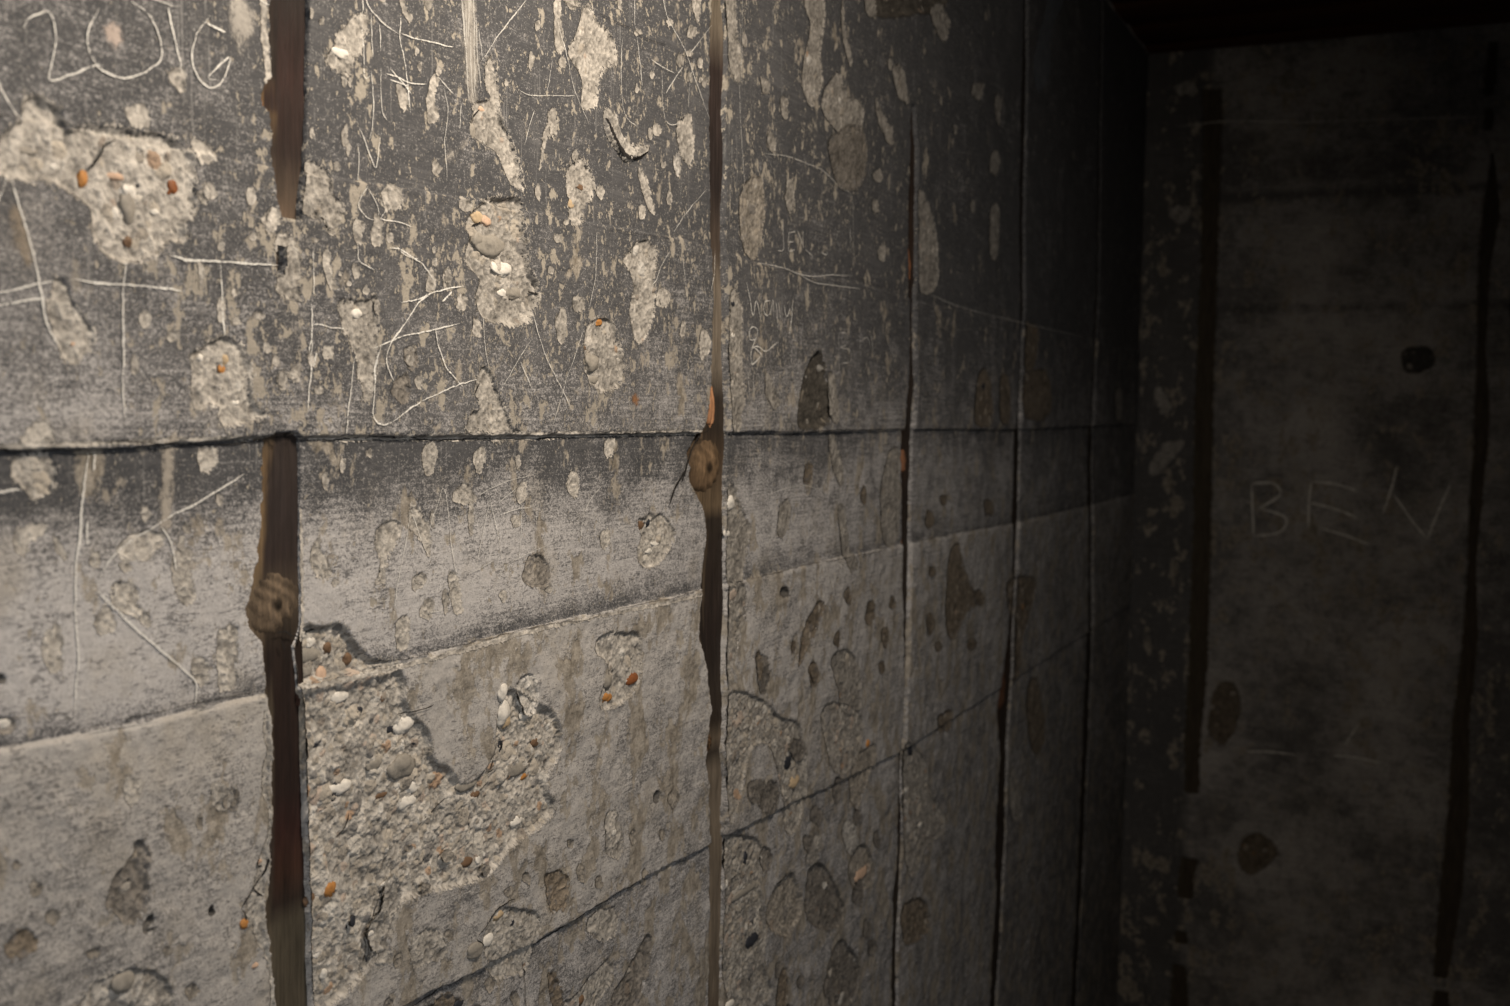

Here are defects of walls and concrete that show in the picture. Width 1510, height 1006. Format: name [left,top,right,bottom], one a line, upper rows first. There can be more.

spalling [0,89,218,266]
spalling [426,55,559,338]
spalling [638,113,695,220]
spalling [0,124,424,503]
spalling [555,238,673,394]
spalling [679,320,711,361]
spalling [729,288,746,441]
spalling [13,521,48,557]
spalling [294,501,703,1006]
spalling [4,860,61,962]